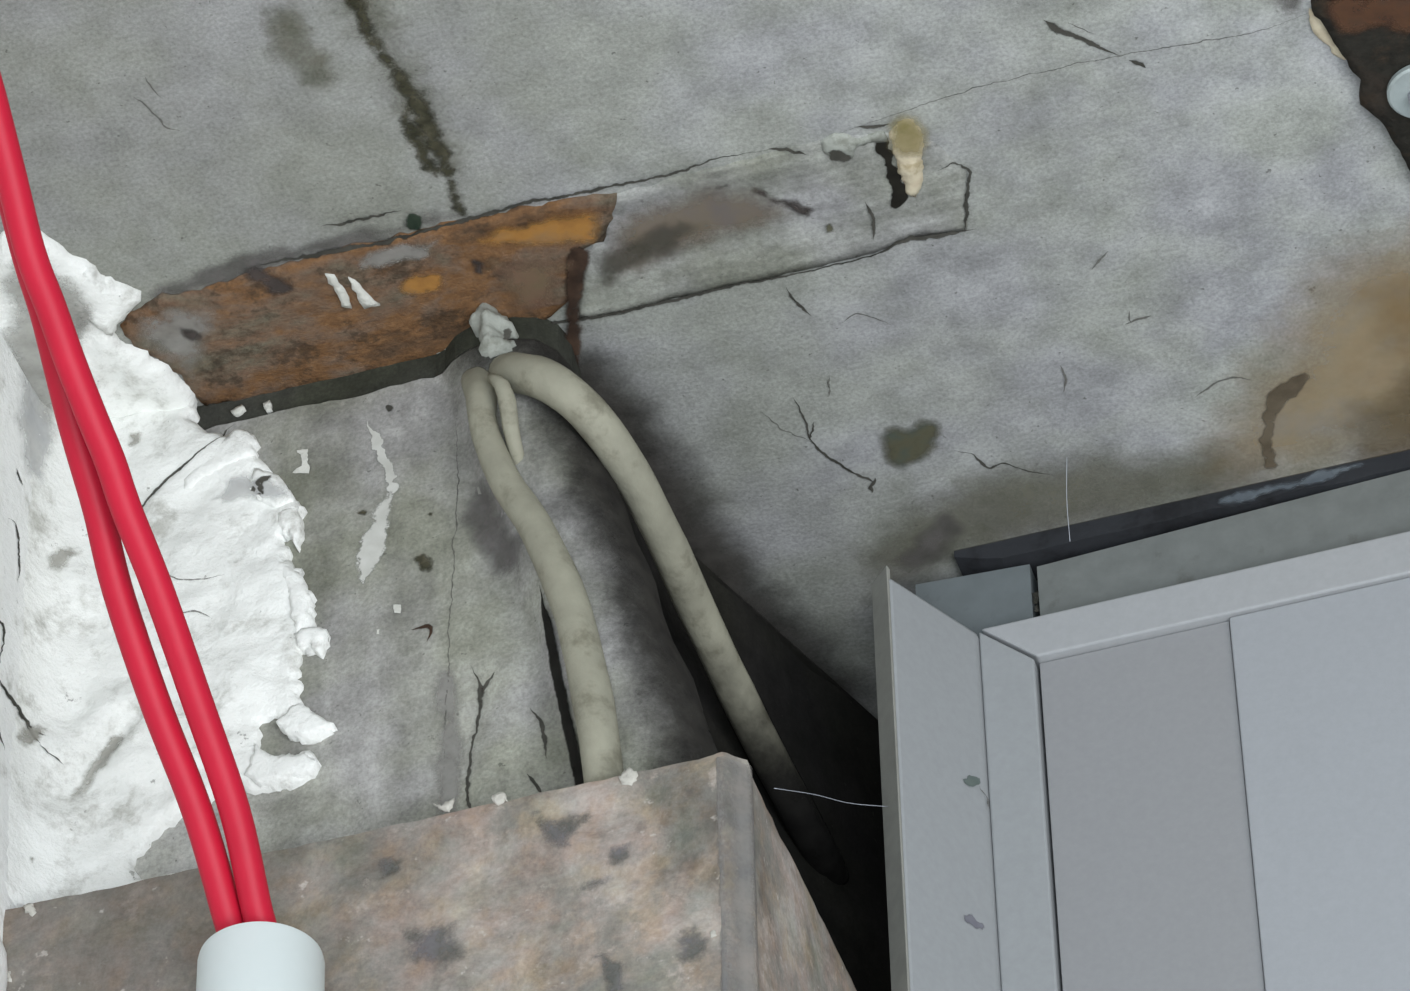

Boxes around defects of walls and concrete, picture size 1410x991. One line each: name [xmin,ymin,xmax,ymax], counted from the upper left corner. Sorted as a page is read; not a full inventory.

leakage [400,107,445,177]
crack [257,147,806,266]
spalling [821,130,908,209]
rust [402,274,440,294]
rust [485,215,598,365]
rust [1247,264,1410,451]
crack [762,376,876,492]
leakage [883,422,938,466]
leakage [1259,373,1309,468]
crack [8,518,21,580]
crack [440,418,494,808]
crack [0,621,60,762]